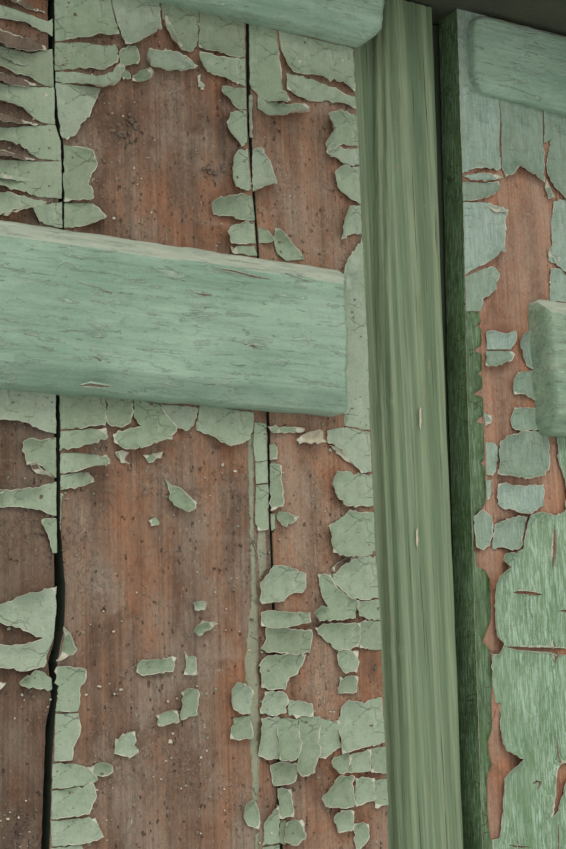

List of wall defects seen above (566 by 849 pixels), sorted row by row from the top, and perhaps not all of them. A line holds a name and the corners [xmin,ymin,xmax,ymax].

peeling [457,9,566,654]
peeling [0,0,389,849]
crack [549,525,557,570]
crack [513,588,542,596]
crack [507,637,566,663]
peeling [487,703,523,843]
peeling [553,763,566,816]
crack [509,841,528,849]